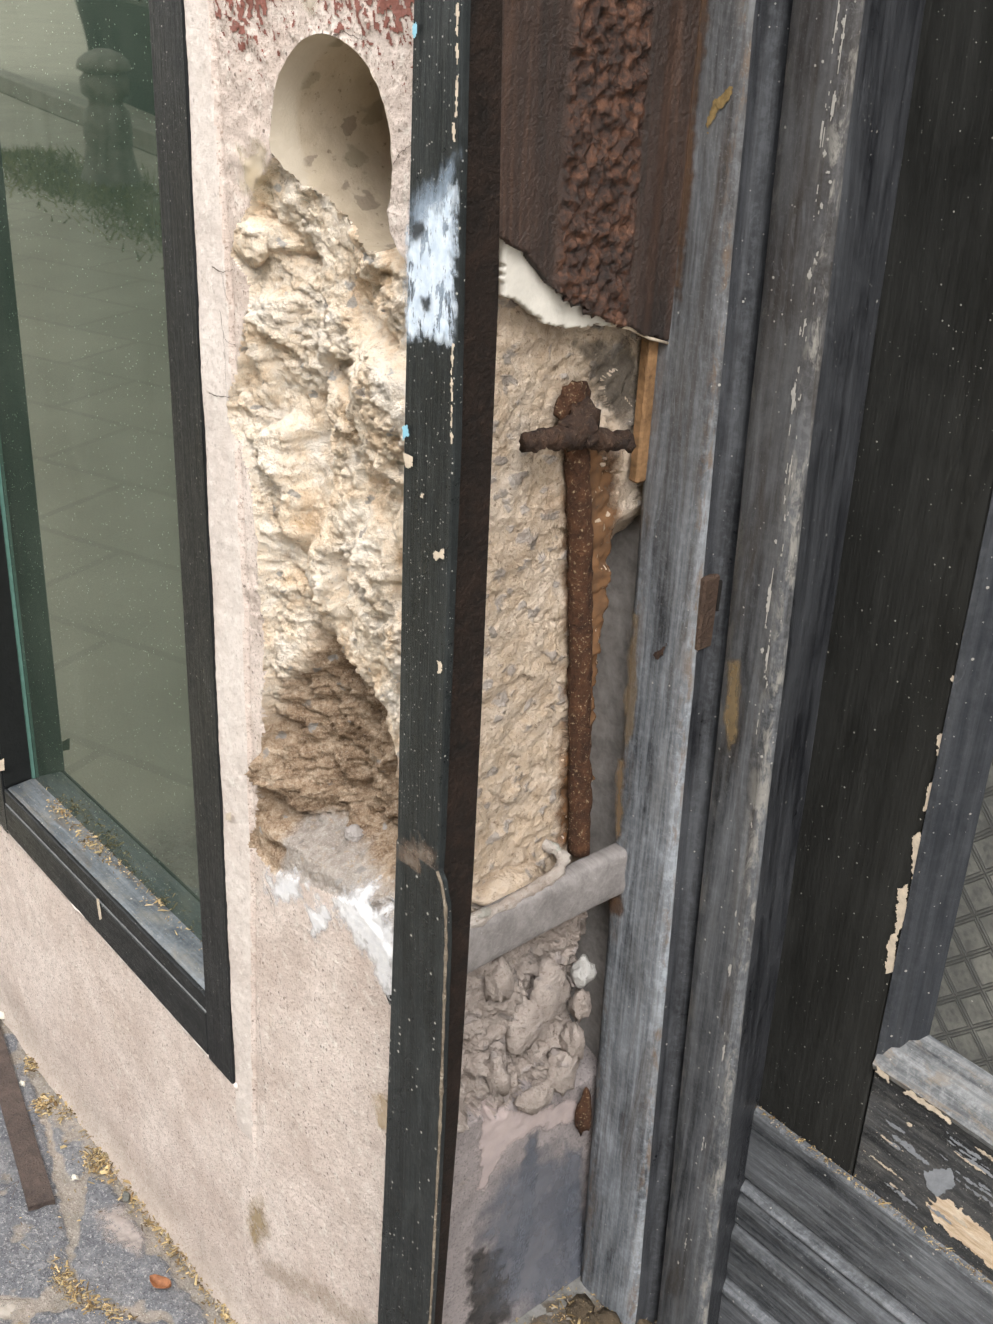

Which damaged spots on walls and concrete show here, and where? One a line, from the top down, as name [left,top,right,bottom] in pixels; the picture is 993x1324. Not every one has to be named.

peeling [213,0,414,93]
spalling [226,156,413,932]
corrosion [588,448,620,731]
corrosion [556,721,569,846]
efflorescence [266,867,393,1001]
peeling [885,832,921,974]
spalling [428,871,597,1324]
peeling [863,1090,993,1269]